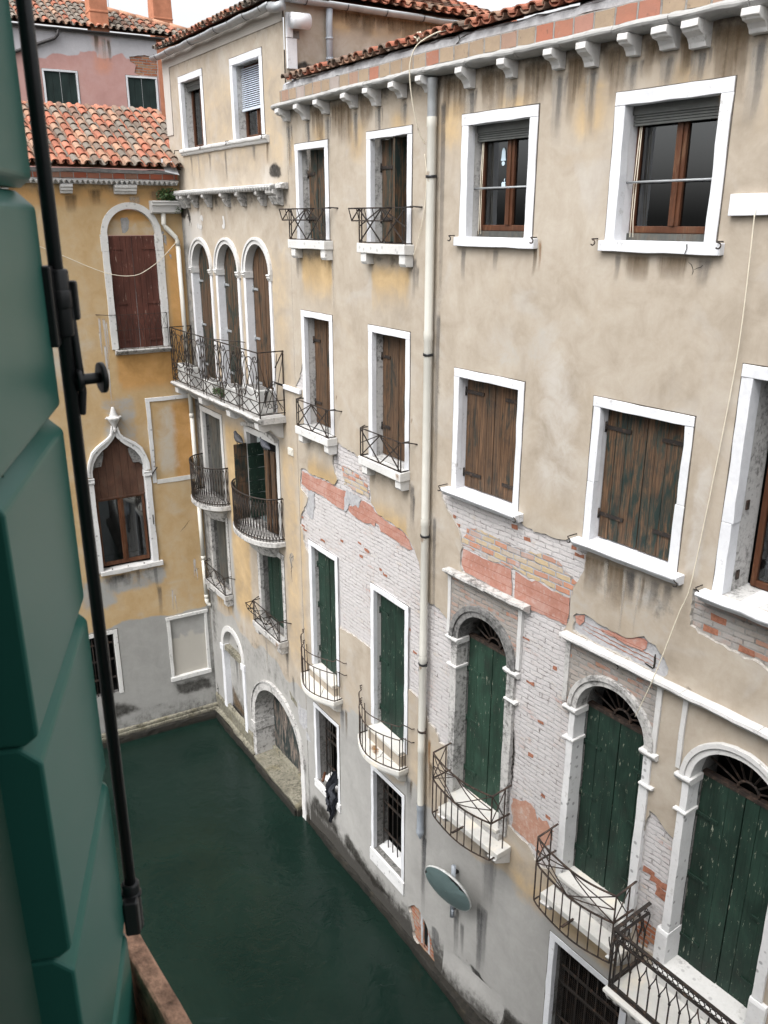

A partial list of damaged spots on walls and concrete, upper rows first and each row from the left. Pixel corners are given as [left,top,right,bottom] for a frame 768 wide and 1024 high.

flaking render [129,55,158,78]
water stain [525,58,597,95]
flaking render [300,443,451,745]
flaking render [689,589,768,671]
flaking render [441,492,668,869]
water stain [313,798,387,895]
flaking render [634,811,673,954]